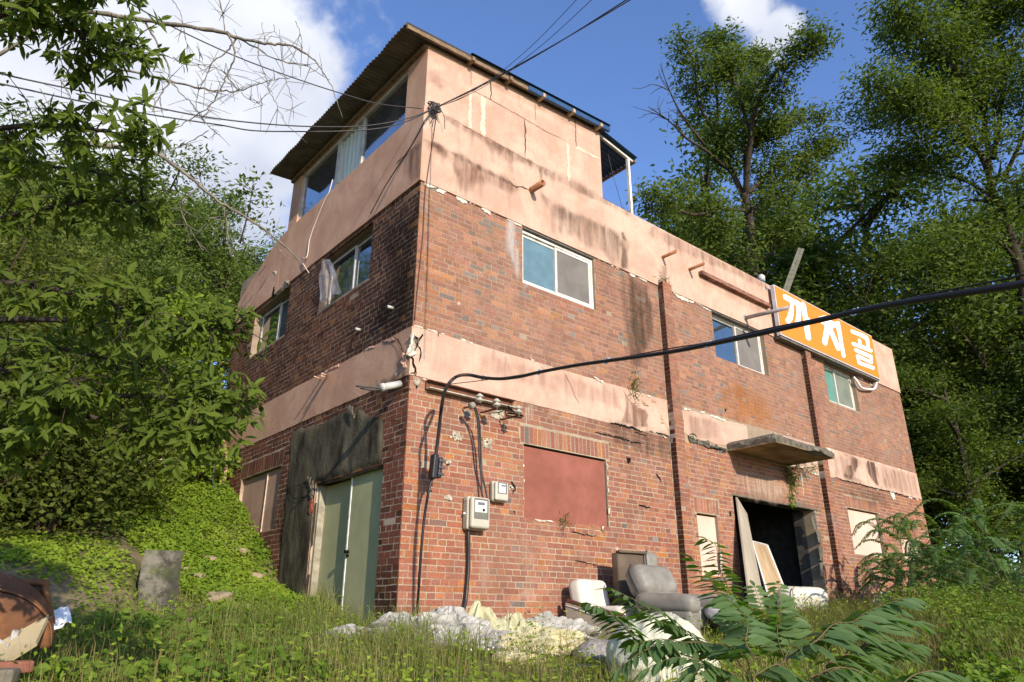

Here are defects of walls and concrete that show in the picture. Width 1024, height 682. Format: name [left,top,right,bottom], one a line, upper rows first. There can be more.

crack [445,72,577,165]
flaking render [424,182,522,227]
flaking render [364,325,445,357]
damp [849,458,878,484]